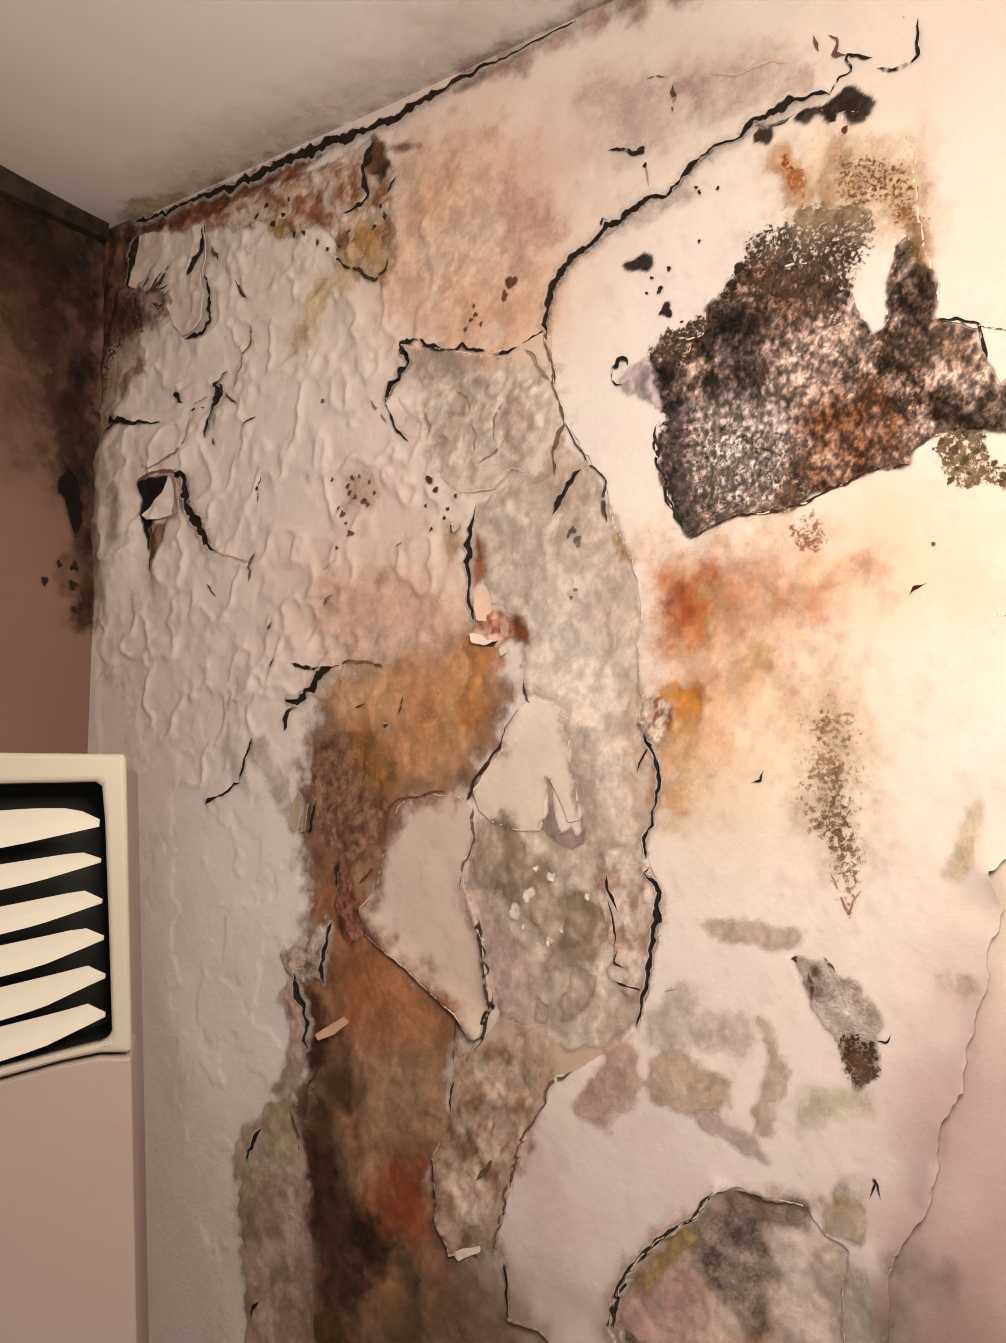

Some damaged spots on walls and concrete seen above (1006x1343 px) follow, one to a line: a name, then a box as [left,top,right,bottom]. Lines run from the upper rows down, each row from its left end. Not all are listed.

crack [134,21,576,233]
leakage [404,0,646,98]
spalling [123,134,412,339]
leakage [0,177,226,629]
leakage [611,200,1006,556]
spalling [249,737,316,833]
peeling [358,108,1006,1343]
spalling [279,915,349,1077]
leakage [233,1046,319,1343]
leakage [830,1254,873,1343]